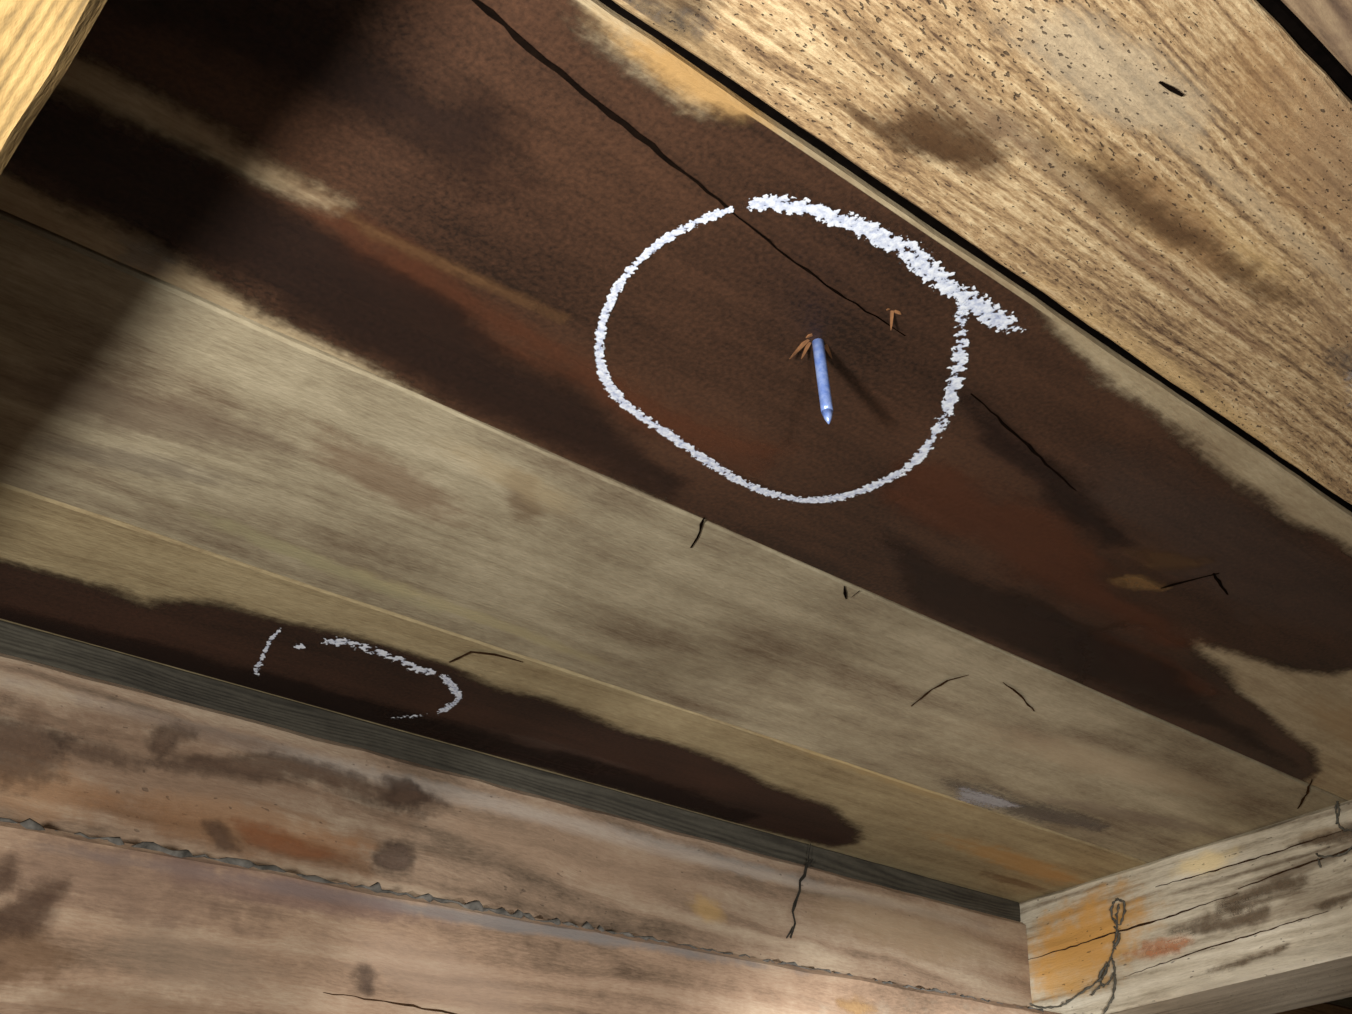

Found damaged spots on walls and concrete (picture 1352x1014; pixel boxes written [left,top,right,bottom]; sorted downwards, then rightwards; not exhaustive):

crack [472,0,906,336]
damp [2,0,1352,782]
damp [0,562,861,846]
crack [911,675,968,706]
damp [1300,826,1352,844]
crack [786,843,813,938]
crack [1028,830,1352,960]
damp [1172,877,1305,934]
damp [1319,896,1349,909]
crack [1125,911,1328,977]
damp [1226,947,1284,966]
crack [323,992,457,1014]